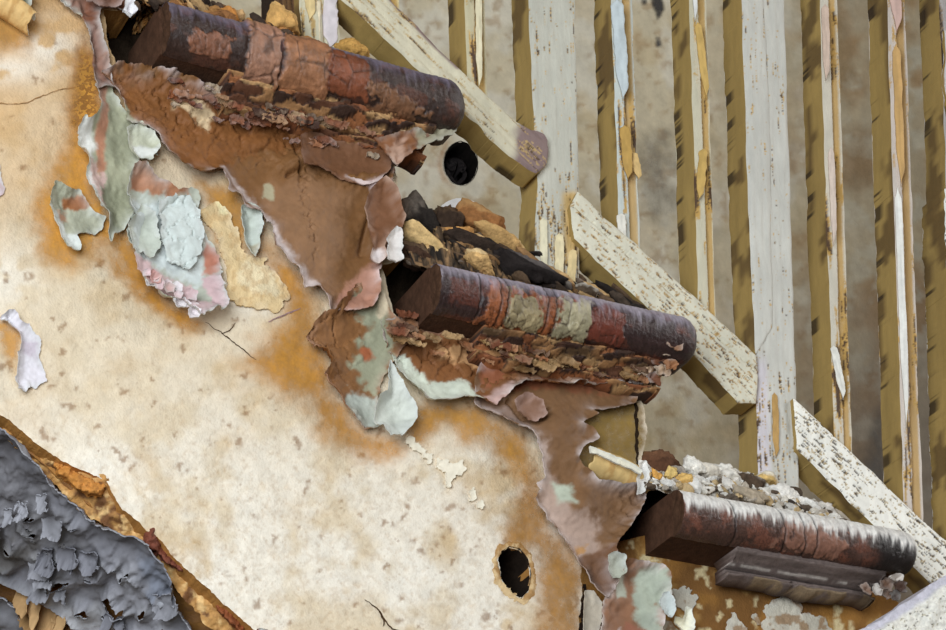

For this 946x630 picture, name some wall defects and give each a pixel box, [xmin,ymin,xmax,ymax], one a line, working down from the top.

peeling [0,0,37,36]
peeling [50,0,698,630]
peeling [0,309,47,392]
peeling [0,428,244,630]
peeling [858,573,907,601]
crack [365,600,397,630]
peeling [725,597,832,630]